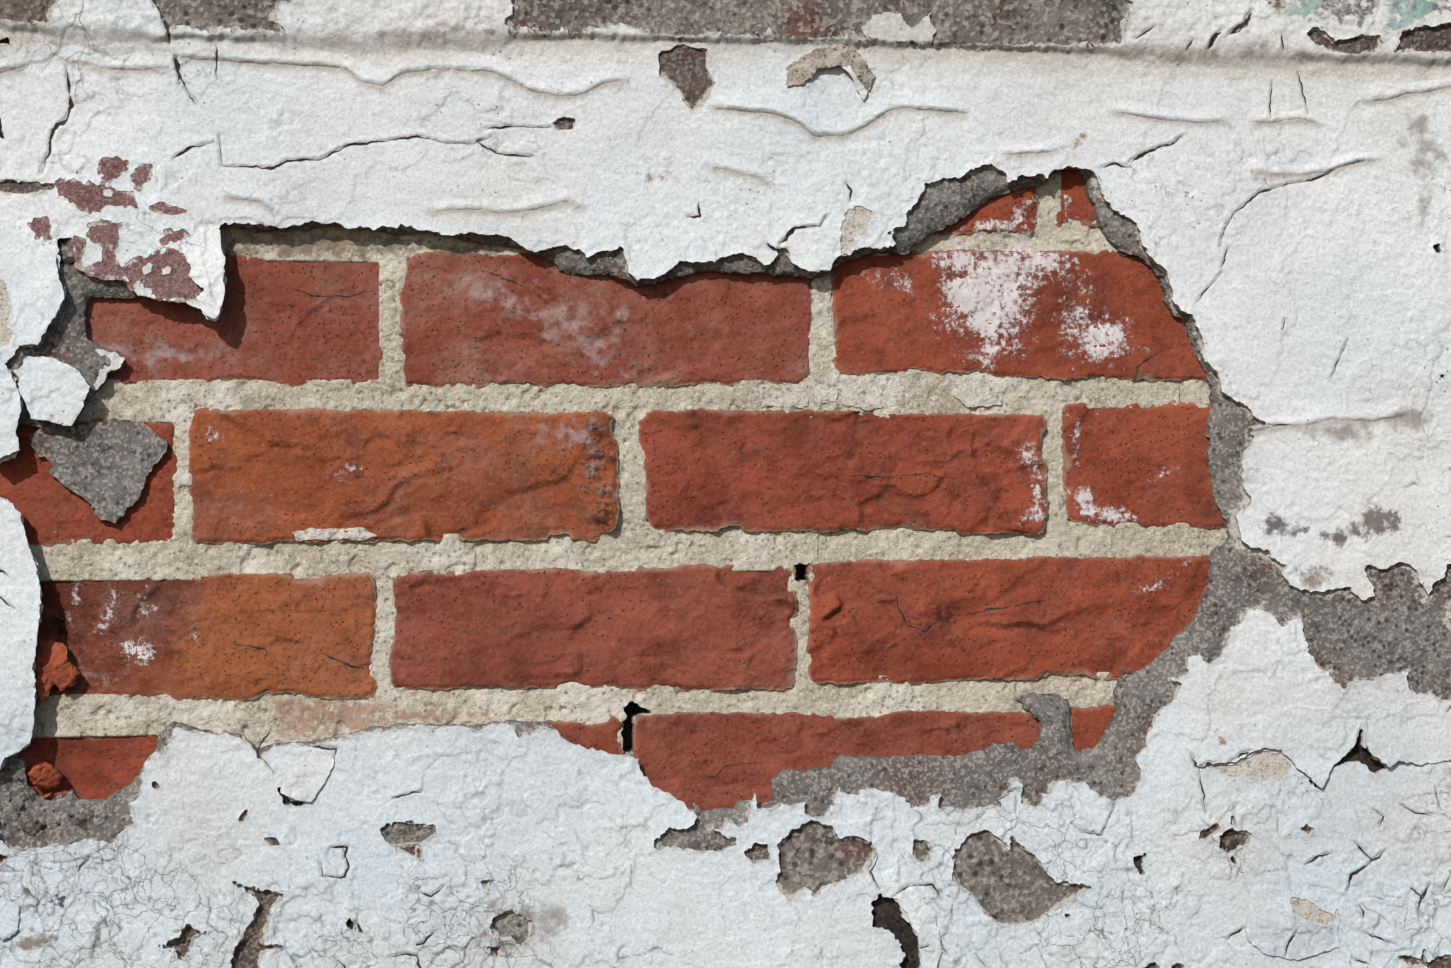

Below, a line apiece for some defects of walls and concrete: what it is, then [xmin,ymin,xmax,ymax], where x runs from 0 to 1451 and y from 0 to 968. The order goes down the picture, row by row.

peeling [504,0,1132,112]
crack [1185,13,1308,116]
crack [41,70,74,173]
crack [175,126,550,170]
crack [767,183,852,251]
spalling [0,155,343,523]
leakage [932,197,1149,371]
spalling [355,164,1451,968]
spalling [0,498,588,866]
peeling [159,924,206,961]
peeling [230,881,283,968]
crack [1305,790,1440,964]